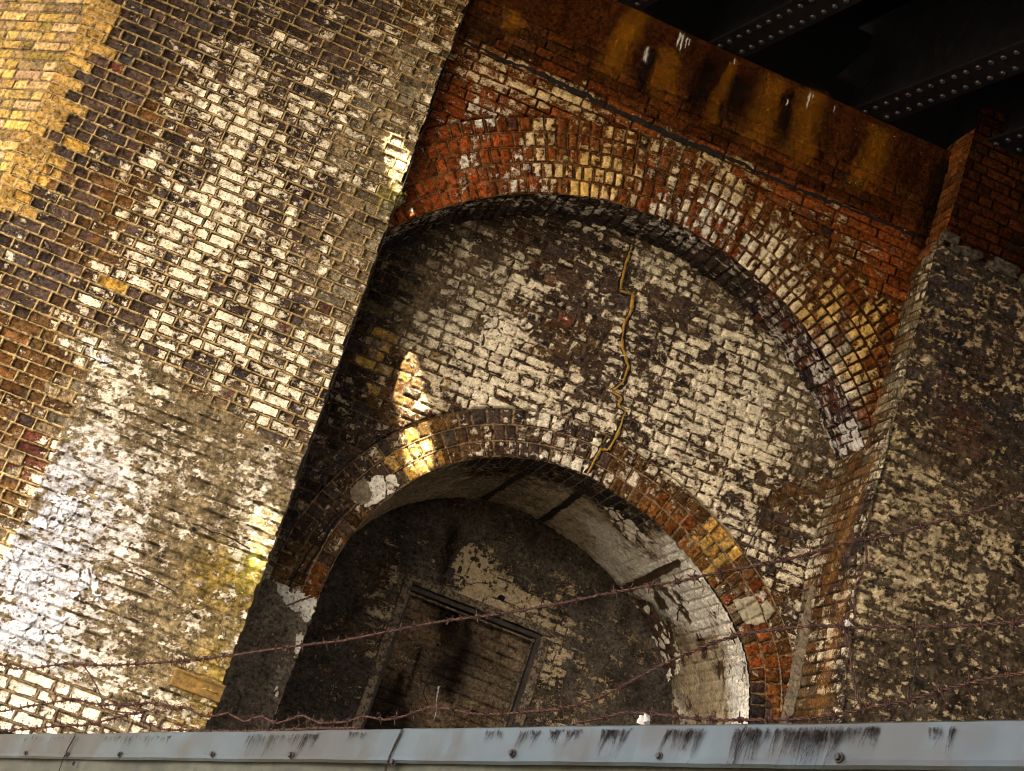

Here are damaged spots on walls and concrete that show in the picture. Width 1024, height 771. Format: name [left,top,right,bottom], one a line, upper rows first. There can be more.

crack [458,38,919,238]
crack [538,243,636,523]
peeling [350,474,400,507]
peeling [268,575,317,654]